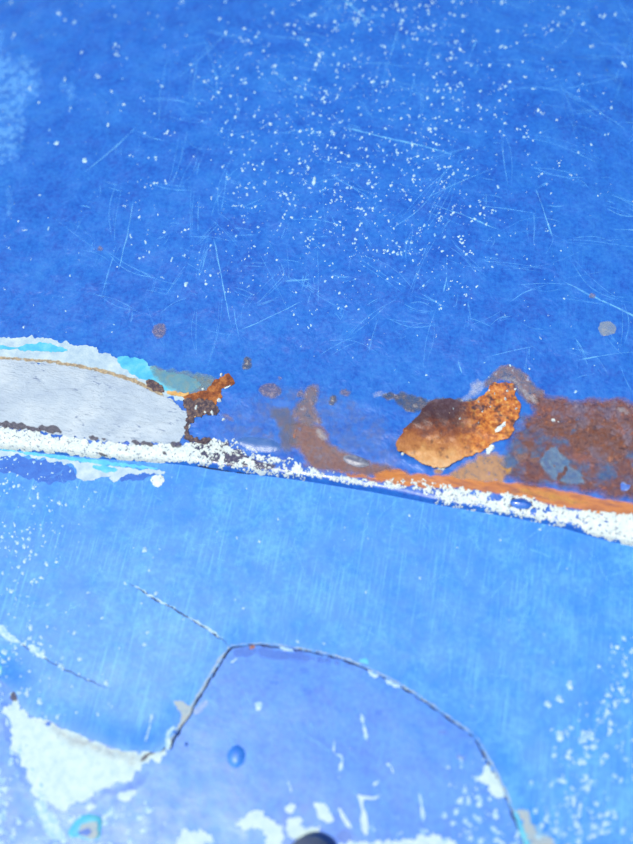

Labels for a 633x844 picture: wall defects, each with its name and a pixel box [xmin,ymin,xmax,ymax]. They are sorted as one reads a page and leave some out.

rust [260,385,280,397]
rust [272,366,633,515]
peeling [0,326,633,844]
crack [129,583,524,844]